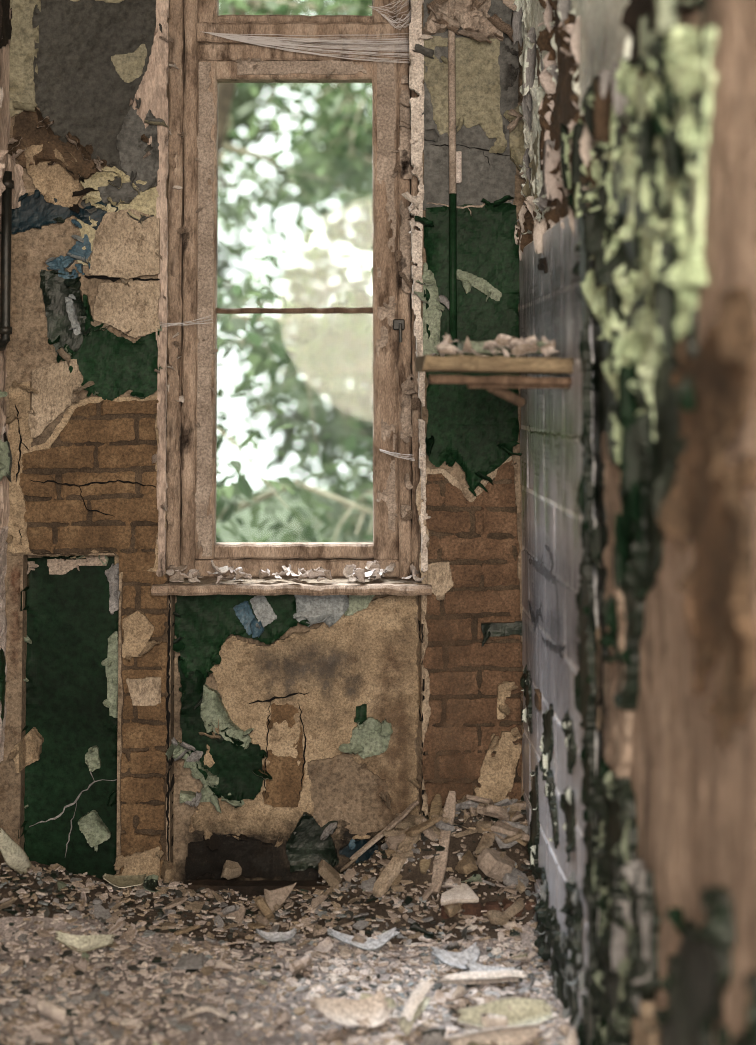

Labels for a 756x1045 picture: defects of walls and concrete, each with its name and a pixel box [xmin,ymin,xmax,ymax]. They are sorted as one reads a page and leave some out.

crack [29,771,117,856]
peeling [0,0,396,880]
peeling [235,0,756,1045]